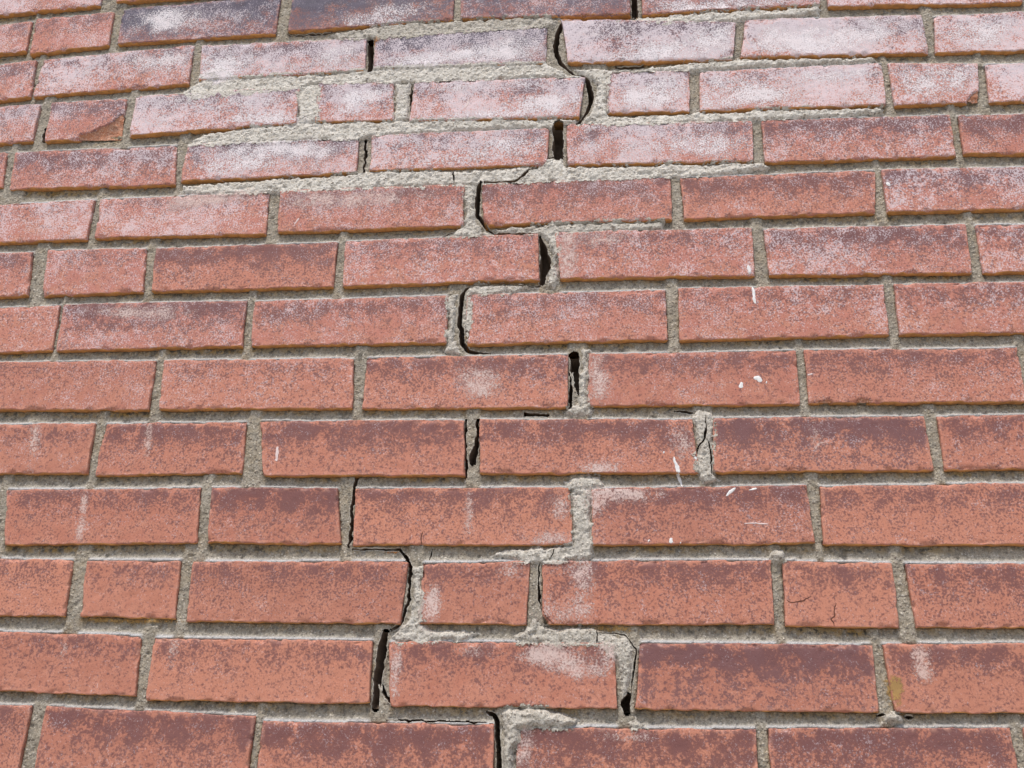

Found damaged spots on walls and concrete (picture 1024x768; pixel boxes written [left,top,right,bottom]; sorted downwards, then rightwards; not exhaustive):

crack [618,0,640,21]
crack [406,85,414,119]
crack [442,23,595,355]
crack [526,356,581,418]
crack [464,420,480,478]
crack [675,410,713,476]
crack [536,549,554,624]
crack [346,478,503,768]
crack [595,630,637,713]